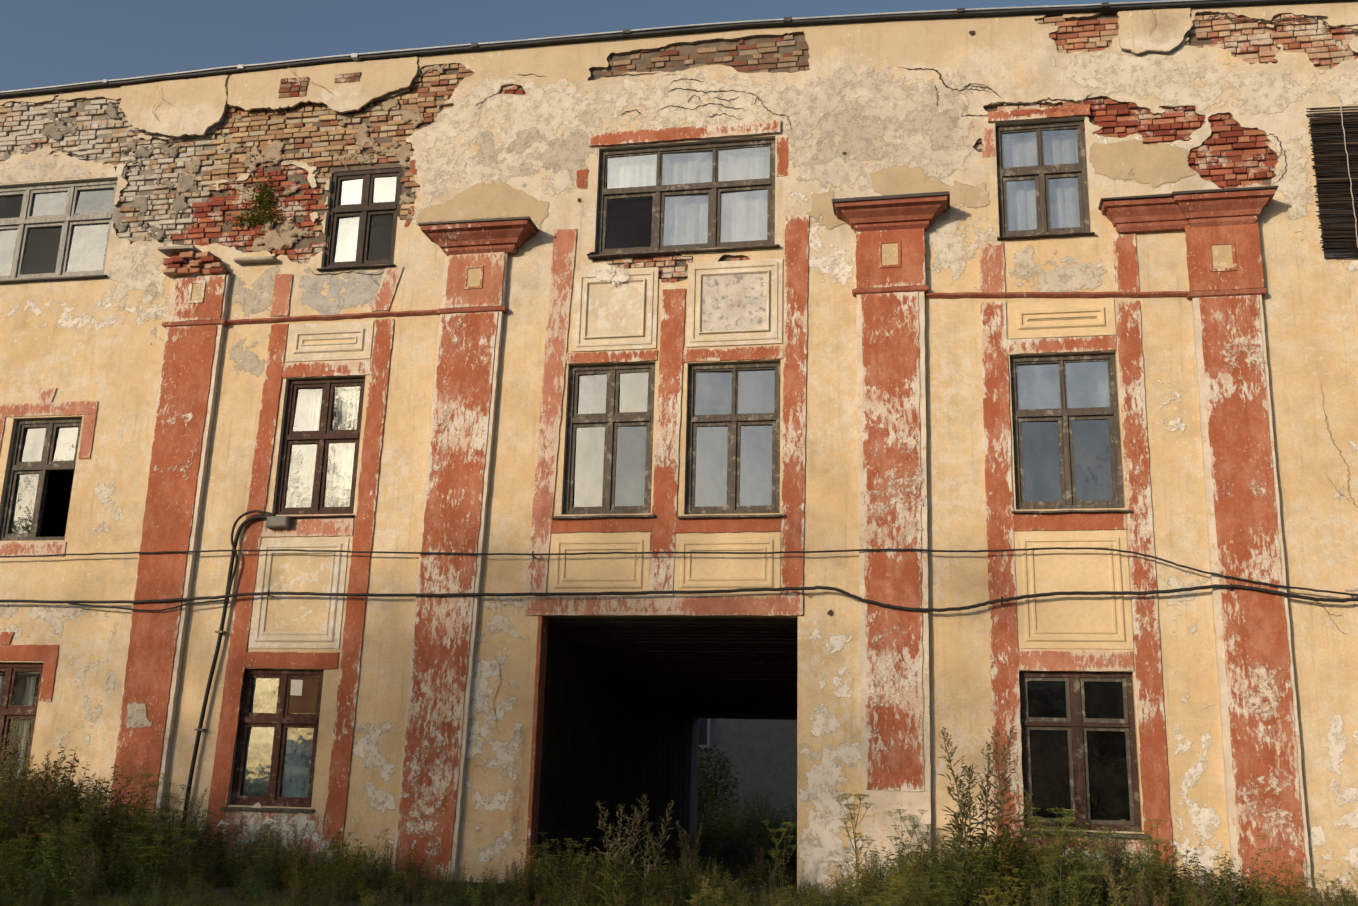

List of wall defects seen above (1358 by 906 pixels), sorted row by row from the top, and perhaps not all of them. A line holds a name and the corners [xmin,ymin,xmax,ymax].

crack [588,72,796,126]
flaking render [0,13,1358,345]
peeling [866,433,925,549]
crack [1320,389,1358,508]
peeling [352,719,446,857]
peeling [465,596,526,863]
peeling [798,628,862,894]
peeling [1244,662,1281,721]
peeling [1237,714,1358,883]